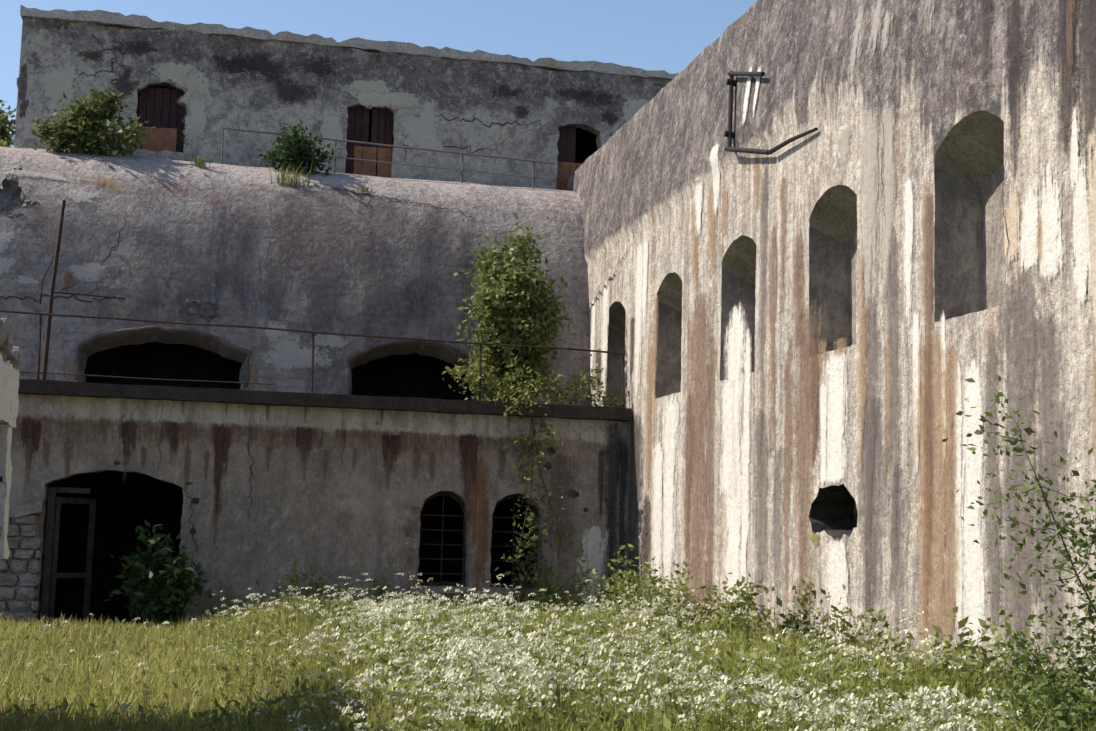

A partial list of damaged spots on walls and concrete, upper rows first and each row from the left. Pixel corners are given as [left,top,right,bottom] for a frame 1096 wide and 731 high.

damp [847,0,893,81]
crack [290,185,476,218]
spalling [0,168,40,285]
crack [0,214,131,302]
rust [21,419,42,464]
rust [121,420,137,464]
rust [165,422,180,454]
rust [213,423,231,514]
crack [247,412,255,525]
rust [296,426,313,466]
rust [381,434,400,470]